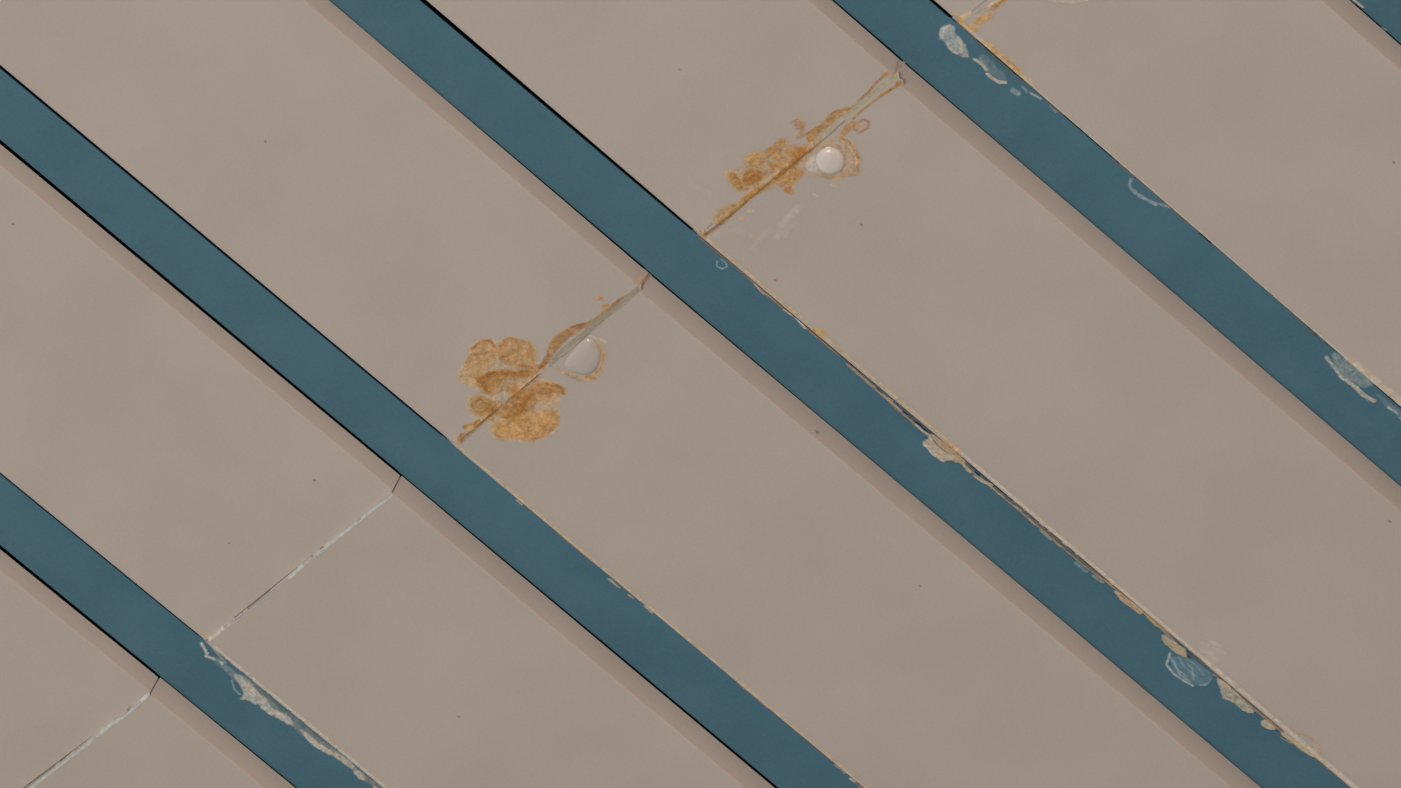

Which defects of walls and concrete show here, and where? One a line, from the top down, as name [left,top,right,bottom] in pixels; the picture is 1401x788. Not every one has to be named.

peeling [938,23,1058,114]
crack [704,72,899,234]
corrosion [451,269,651,445]
crack [465,285,641,436]
peeling [921,433,967,464]
corrosion [692,71,1351,788]
crack [202,492,395,642]
crack [28,692,150,788]
peeling [1164,651,1215,688]